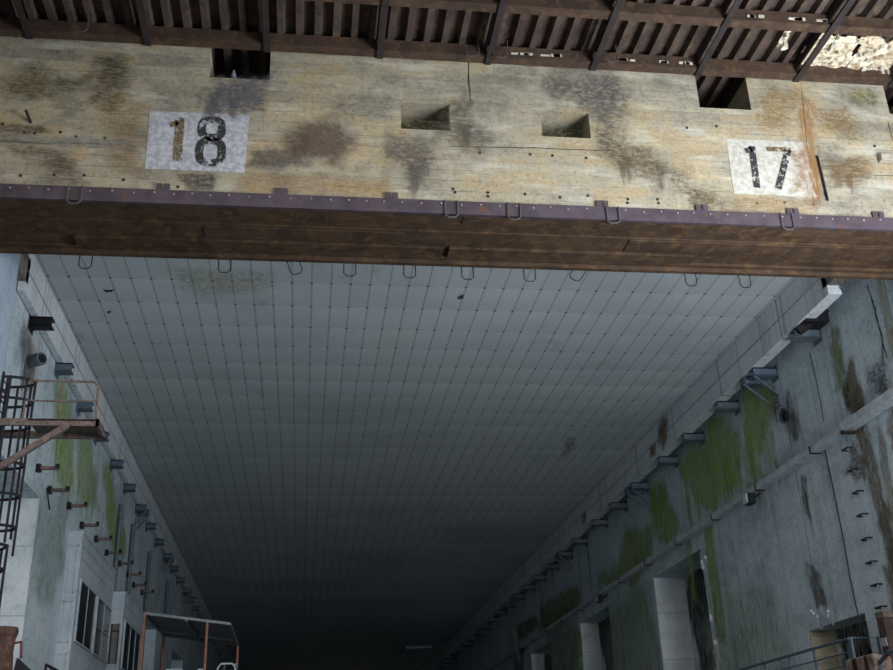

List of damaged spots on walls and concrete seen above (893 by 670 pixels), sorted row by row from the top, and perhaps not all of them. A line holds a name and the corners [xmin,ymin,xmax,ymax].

peeling [777,31,791,51]
peeling [801,33,893,74]
leakage [9,57,129,111]
leakage [386,136,434,190]
leakage [545,76,681,186]
corrosion [767,91,866,195]
leakage [838,355,865,414]
leakage [857,424,893,609]